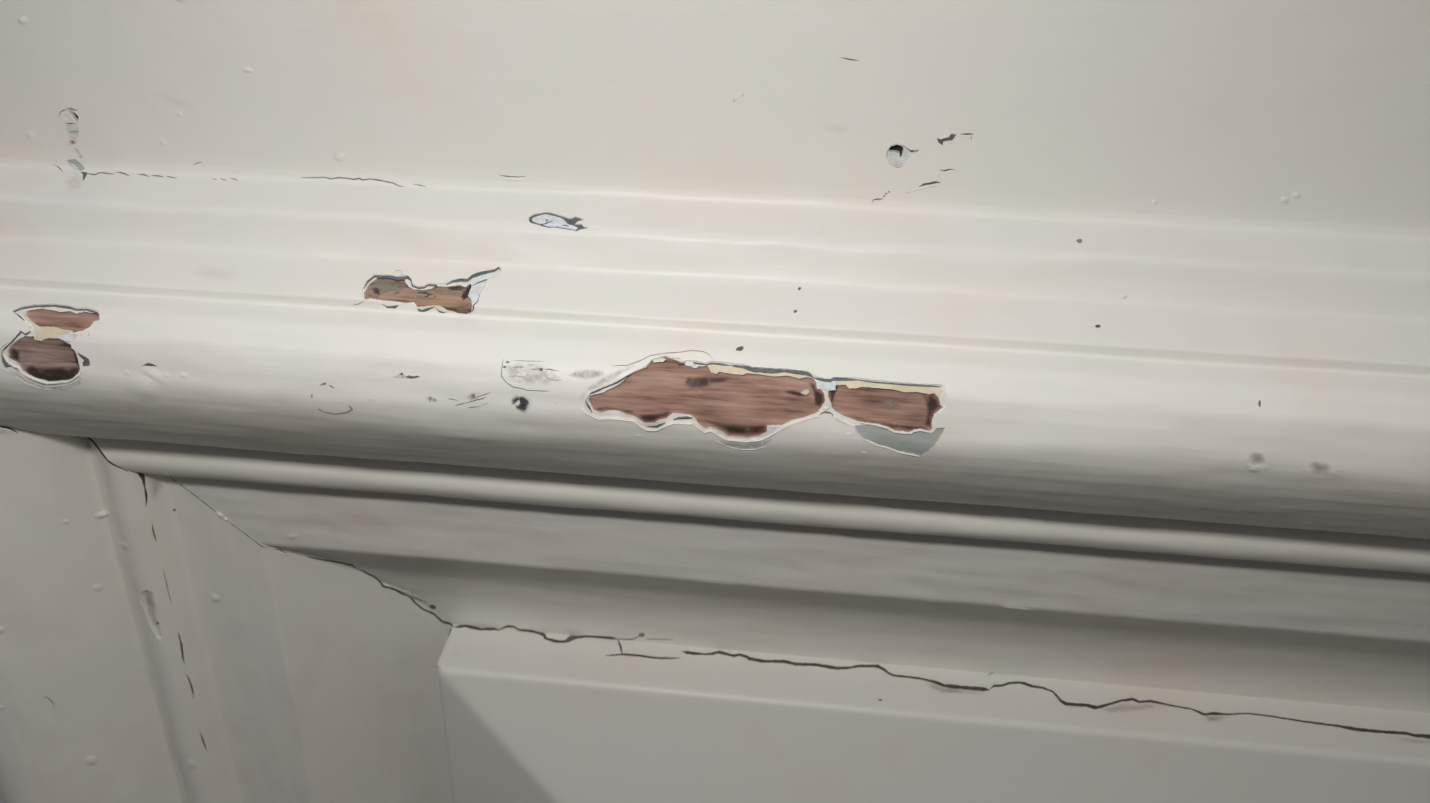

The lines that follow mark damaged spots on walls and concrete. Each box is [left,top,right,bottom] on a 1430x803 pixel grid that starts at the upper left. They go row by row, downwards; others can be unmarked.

peeling [351,267,502,314]
peeling [0,304,101,390]
peeling [580,350,947,457]
crack [87,437,1430,739]